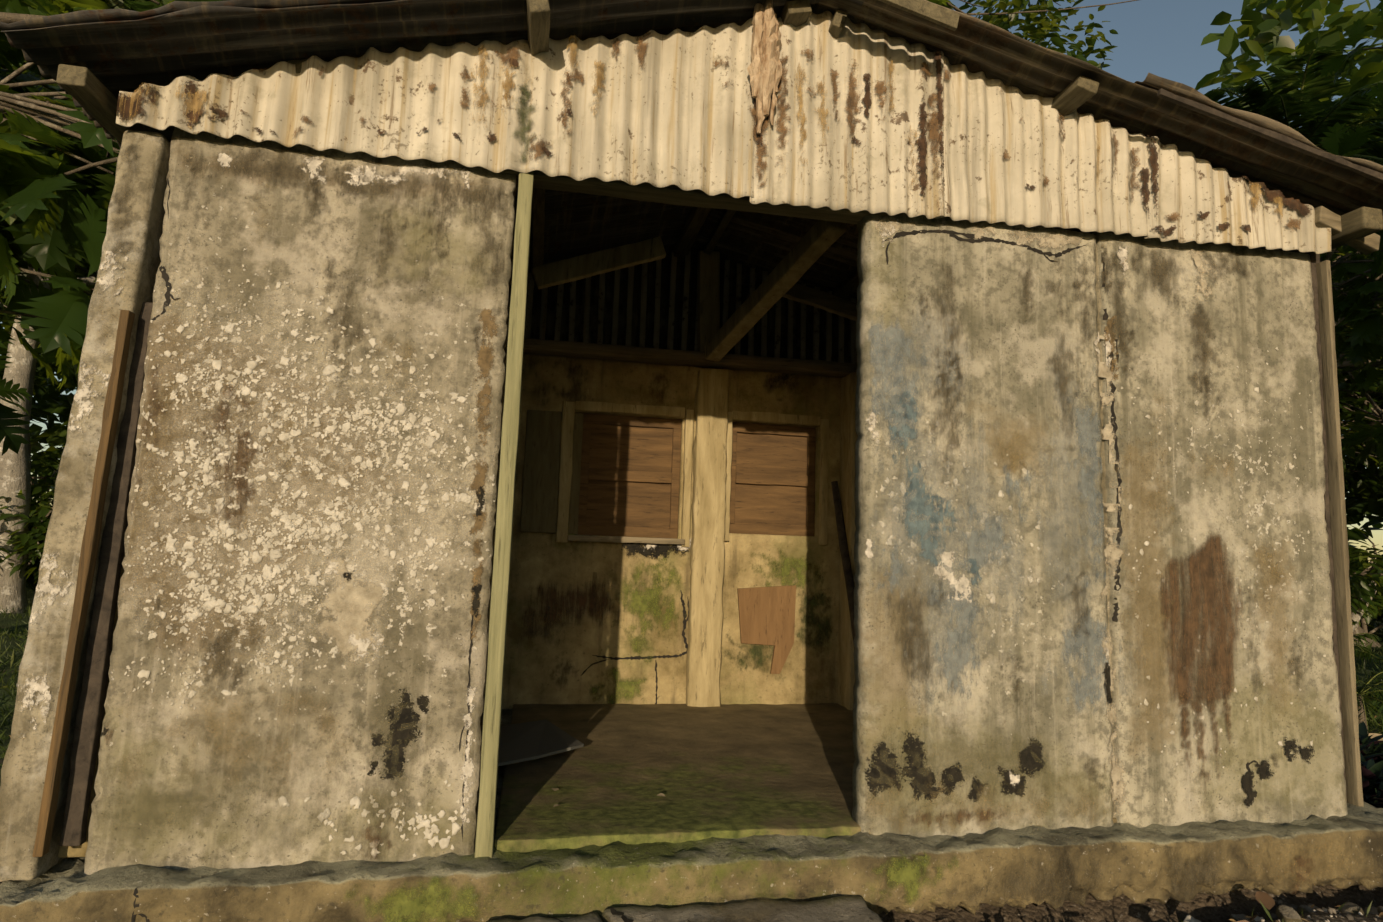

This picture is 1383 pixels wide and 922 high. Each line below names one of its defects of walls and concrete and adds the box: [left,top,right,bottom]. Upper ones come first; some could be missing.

rust [116,80,276,135]
rust [460,47,520,143]
rust [748,49,895,187]
rust [908,50,951,203]
rust [1097,130,1182,236]
rust [1198,176,1313,233]
crack [882,229,1123,622]
crack [581,590,689,704]
damp [367,689,430,780]
damp [864,733,1044,825]
damp [1242,737,1315,807]